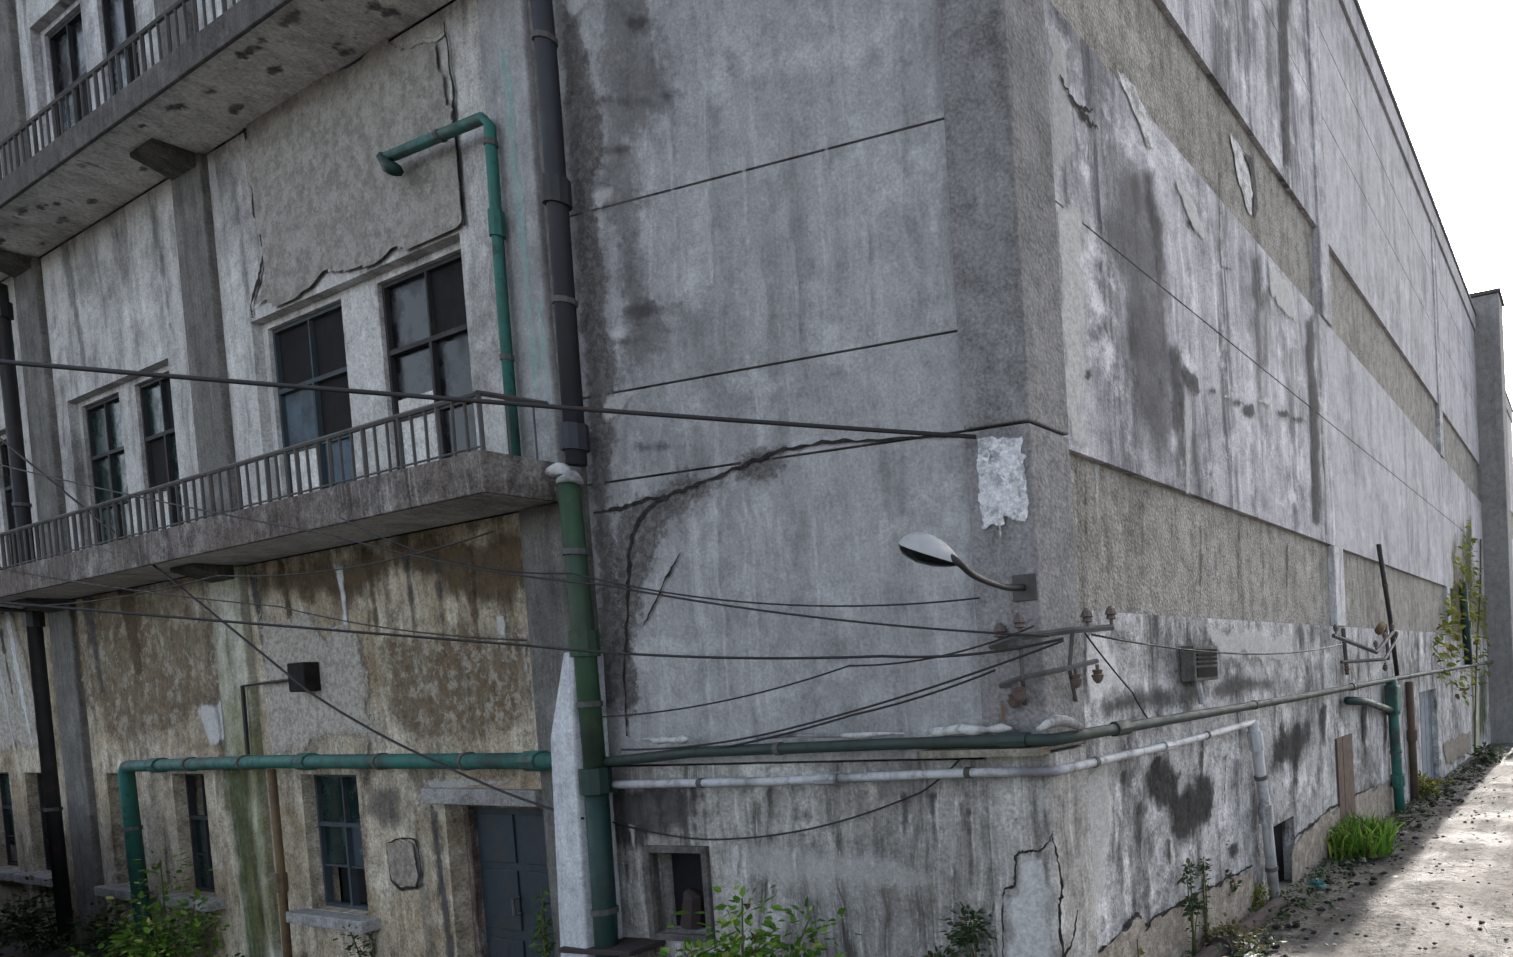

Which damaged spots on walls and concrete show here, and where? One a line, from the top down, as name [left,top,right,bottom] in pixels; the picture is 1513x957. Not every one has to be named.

damp [1048,29,1071,165]
damp [1277,0,1291,164]
peeling [1230,133,1258,218]
damp [1057,204,1088,446]
peeling [976,436,1029,529]
damp [1170,347,1191,493]
damp [1307,318,1321,524]
damp [246,532,527,671]
crack [593,436,947,736]
damp [1087,626,1290,716]
damp [1139,740,1228,865]
crack [1001,831,1078,957]